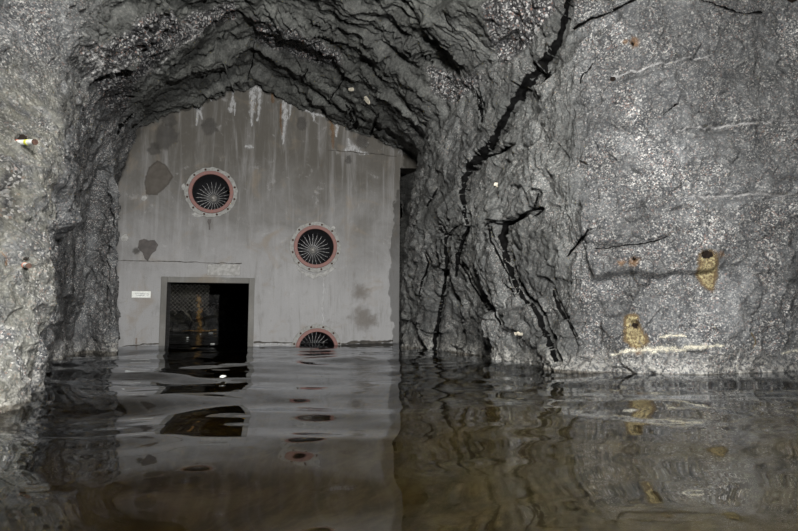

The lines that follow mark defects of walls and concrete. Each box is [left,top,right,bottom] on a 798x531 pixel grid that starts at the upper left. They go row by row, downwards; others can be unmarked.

crack [701,0,763,15]
water stain [195,107,217,134]
efflorescence [249,85,262,126]
water stain [282,100,326,144]
crack [418,0,635,362]
water stain [133,239,158,261]
crack [566,229,668,257]
corrosion [696,249,720,291]
corrosion [623,314,649,350]